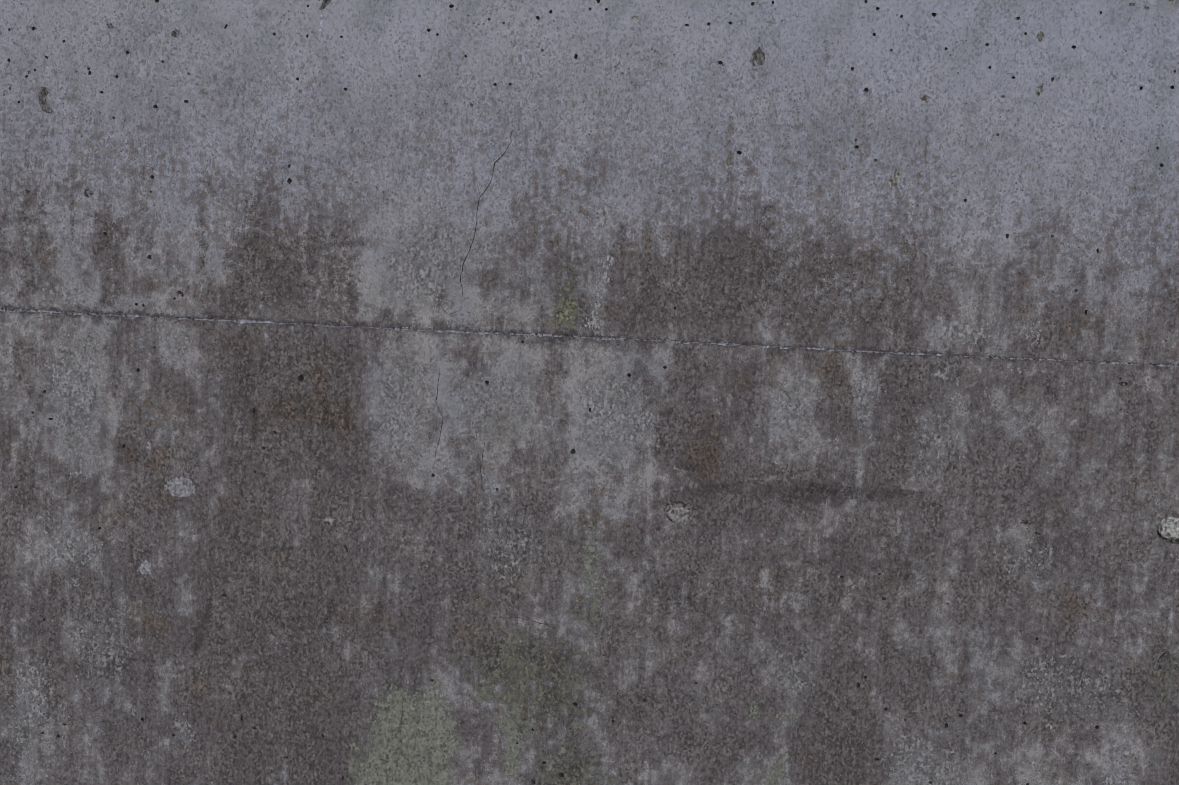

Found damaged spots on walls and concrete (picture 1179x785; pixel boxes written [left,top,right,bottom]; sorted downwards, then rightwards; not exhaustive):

leakage [18,186,49,300]
leakage [171,192,383,785]
crack [444,121,513,314]
leakage [606,205,945,785]